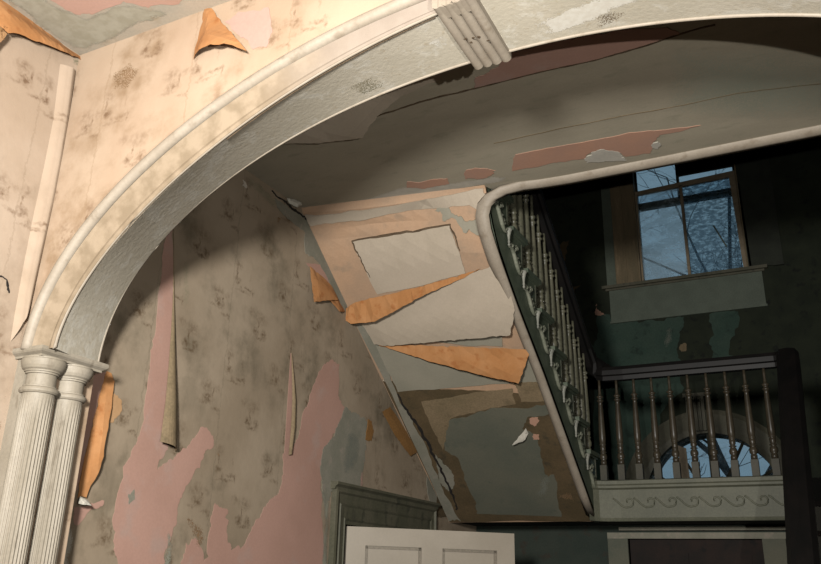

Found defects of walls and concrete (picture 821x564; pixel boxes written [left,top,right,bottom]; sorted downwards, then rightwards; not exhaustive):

peeling [51,0,182,15]
peeling [225,7,273,50]
crack [494,83,821,144]
peeling [512,125,701,171]
peeling [275,168,495,310]
peeling [112,230,345,564]
peeling [355,323,590,522]
peeling [73,500,104,525]